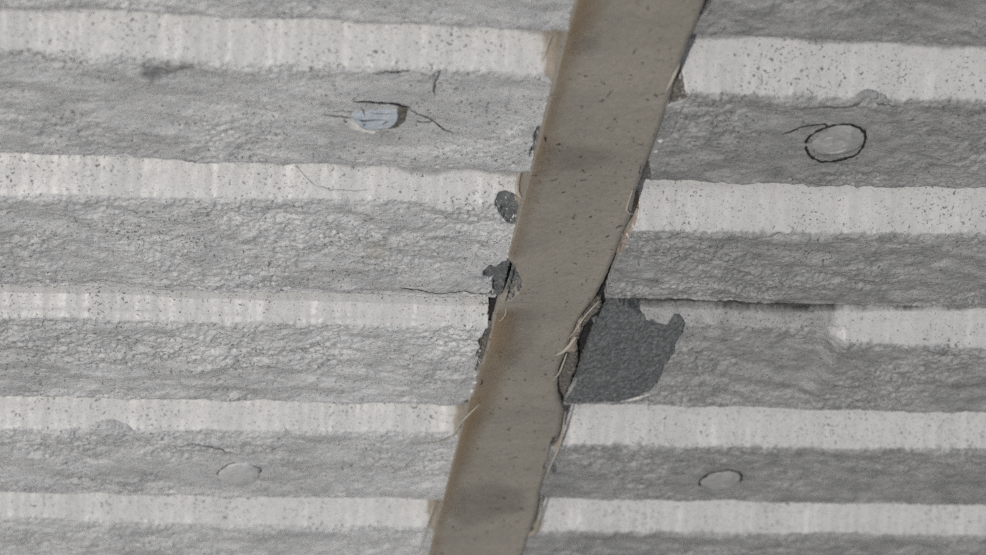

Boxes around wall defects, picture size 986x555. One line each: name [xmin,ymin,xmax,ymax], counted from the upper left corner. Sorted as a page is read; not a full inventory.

peeling [344,101,411,142]
spalling [483,190,519,295]
spalling [563,297,685,403]